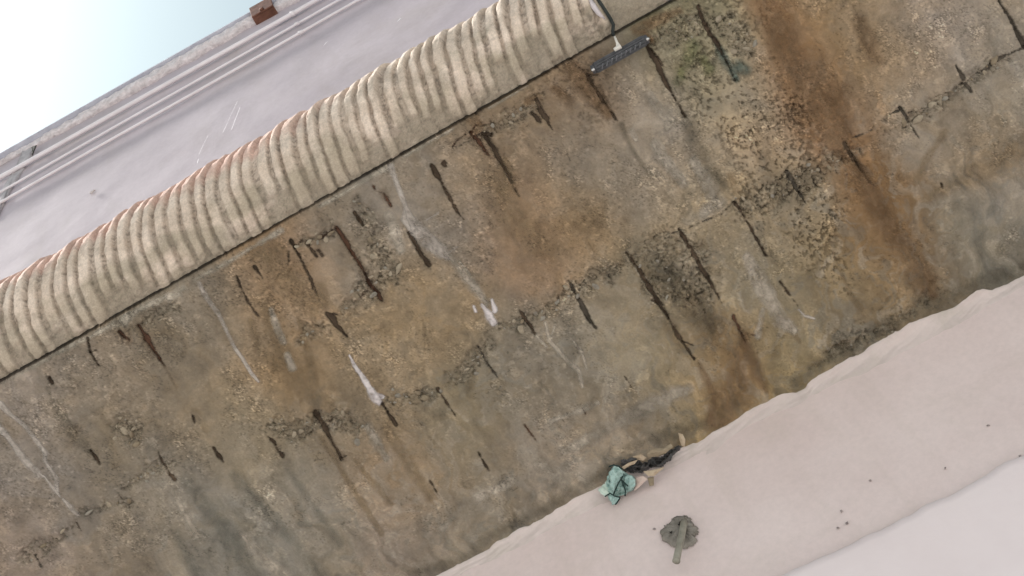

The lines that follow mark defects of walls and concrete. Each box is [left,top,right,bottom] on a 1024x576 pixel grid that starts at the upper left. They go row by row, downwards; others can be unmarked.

crack [645,42,686,118]
crack [697,4,736,81]
crack [955,0,1024,93]
crack [430,124,519,220]
damp [221,318,259,382]
crack [288,211,383,337]
damp [349,355,385,405]
crack [569,282,597,329]
crack [626,252,695,360]
crack [669,201,767,343]
damp [744,254,815,339]
damp [0,401,79,516]